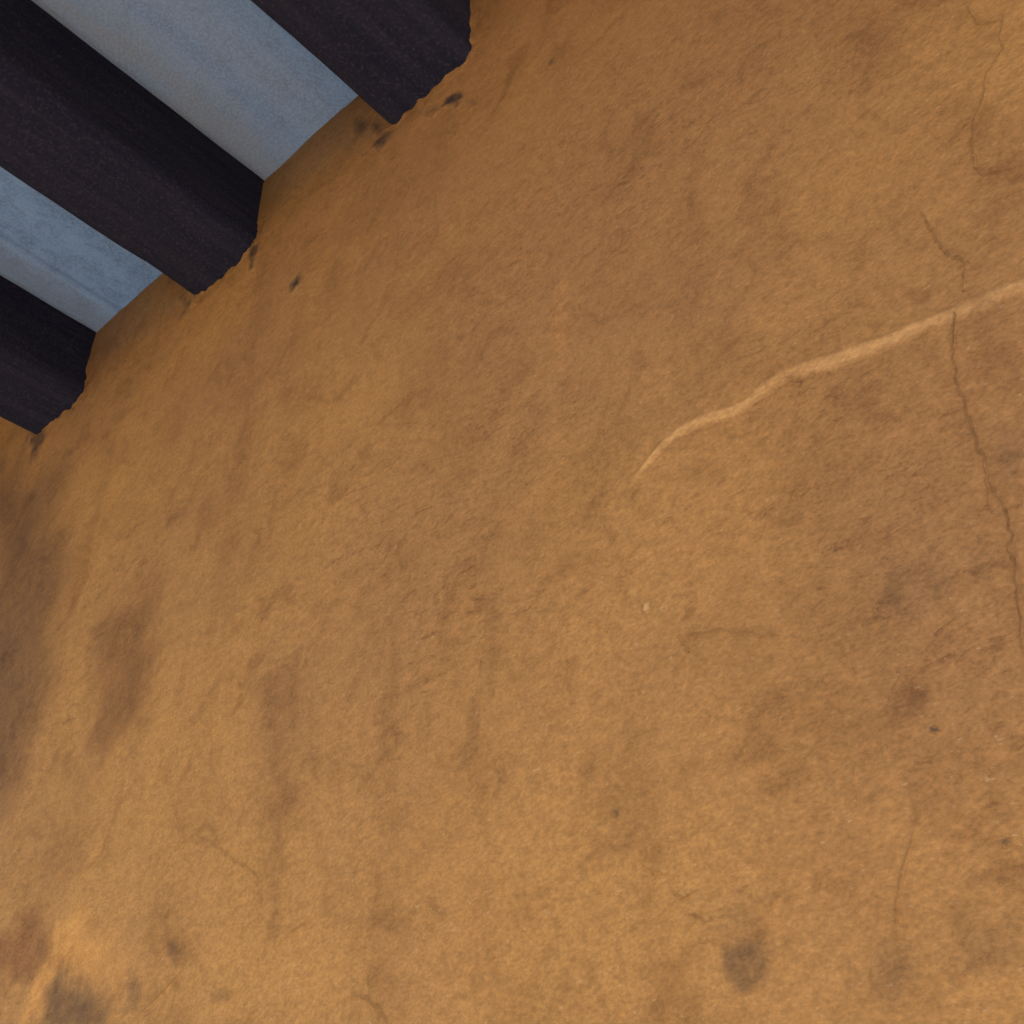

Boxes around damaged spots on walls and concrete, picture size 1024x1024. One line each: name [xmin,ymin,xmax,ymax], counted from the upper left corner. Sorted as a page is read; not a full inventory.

crack [968,5,1016,176]
crack [920,211,1024,649]